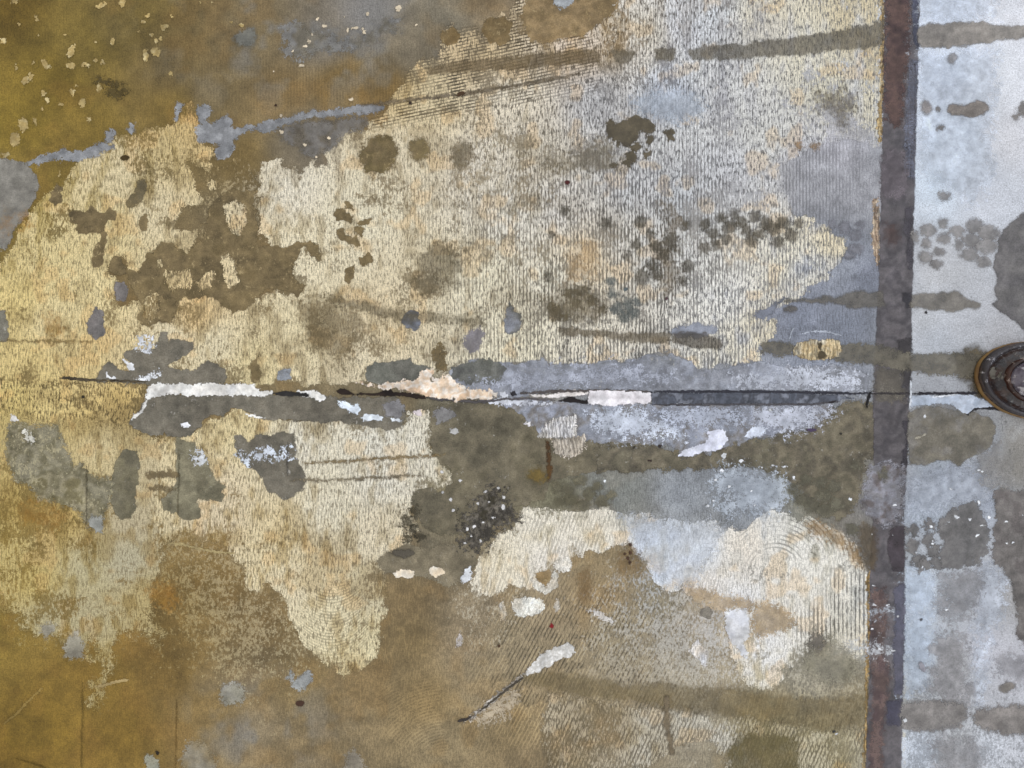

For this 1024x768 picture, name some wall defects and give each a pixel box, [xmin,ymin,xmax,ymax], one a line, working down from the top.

leakage [917,21,1024,63]
leakage [609,129,675,169]
leakage [910,213,1024,329]
crack [62,375,146,383]
crack [272,390,309,398]
peeling [49,179,874,588]
crack [336,388,1000,415]
peeling [2,419,140,531]
leakage [392,504,426,559]
leakage [441,474,529,557]
leakage [553,482,617,511]
leakage [899,487,1024,768]